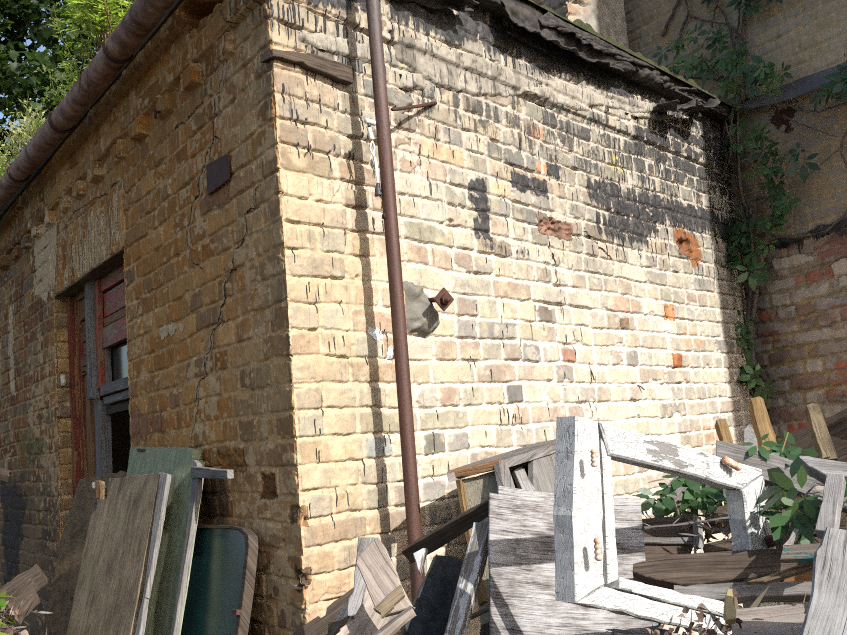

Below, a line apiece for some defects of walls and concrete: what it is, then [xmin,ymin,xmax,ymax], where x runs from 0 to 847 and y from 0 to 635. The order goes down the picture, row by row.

leakage [387,10,417,79]
crack [189,157,265,448]
leakage [596,106,724,280]
rust [674,228,703,267]